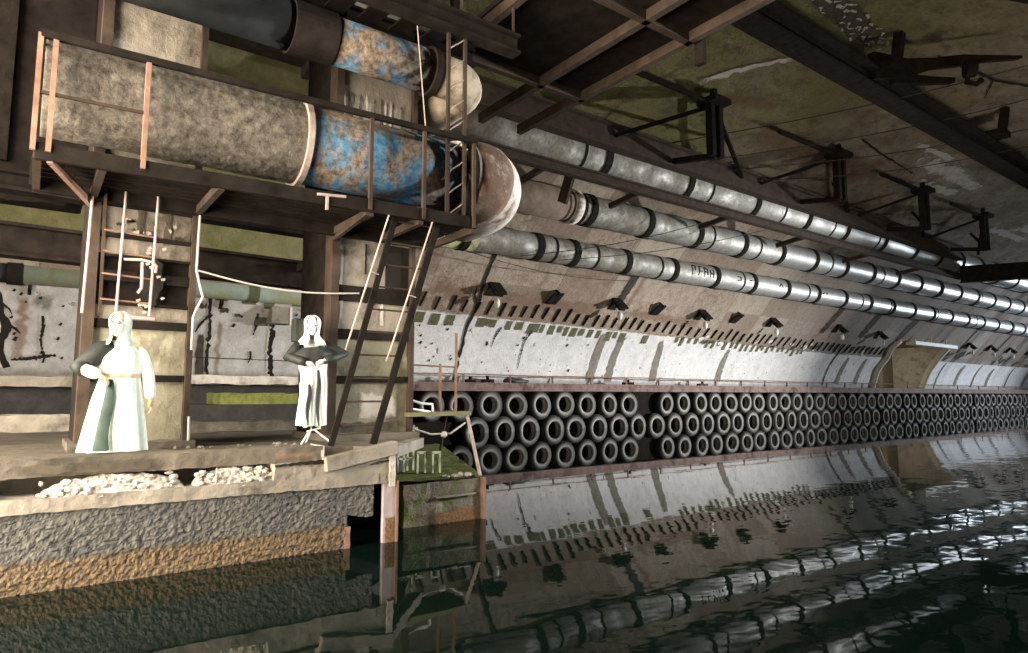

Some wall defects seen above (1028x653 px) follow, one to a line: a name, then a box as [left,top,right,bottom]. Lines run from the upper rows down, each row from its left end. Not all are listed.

spalling [812,0,890,54]
damp [35,295,51,309]
damp [195,335,204,374]